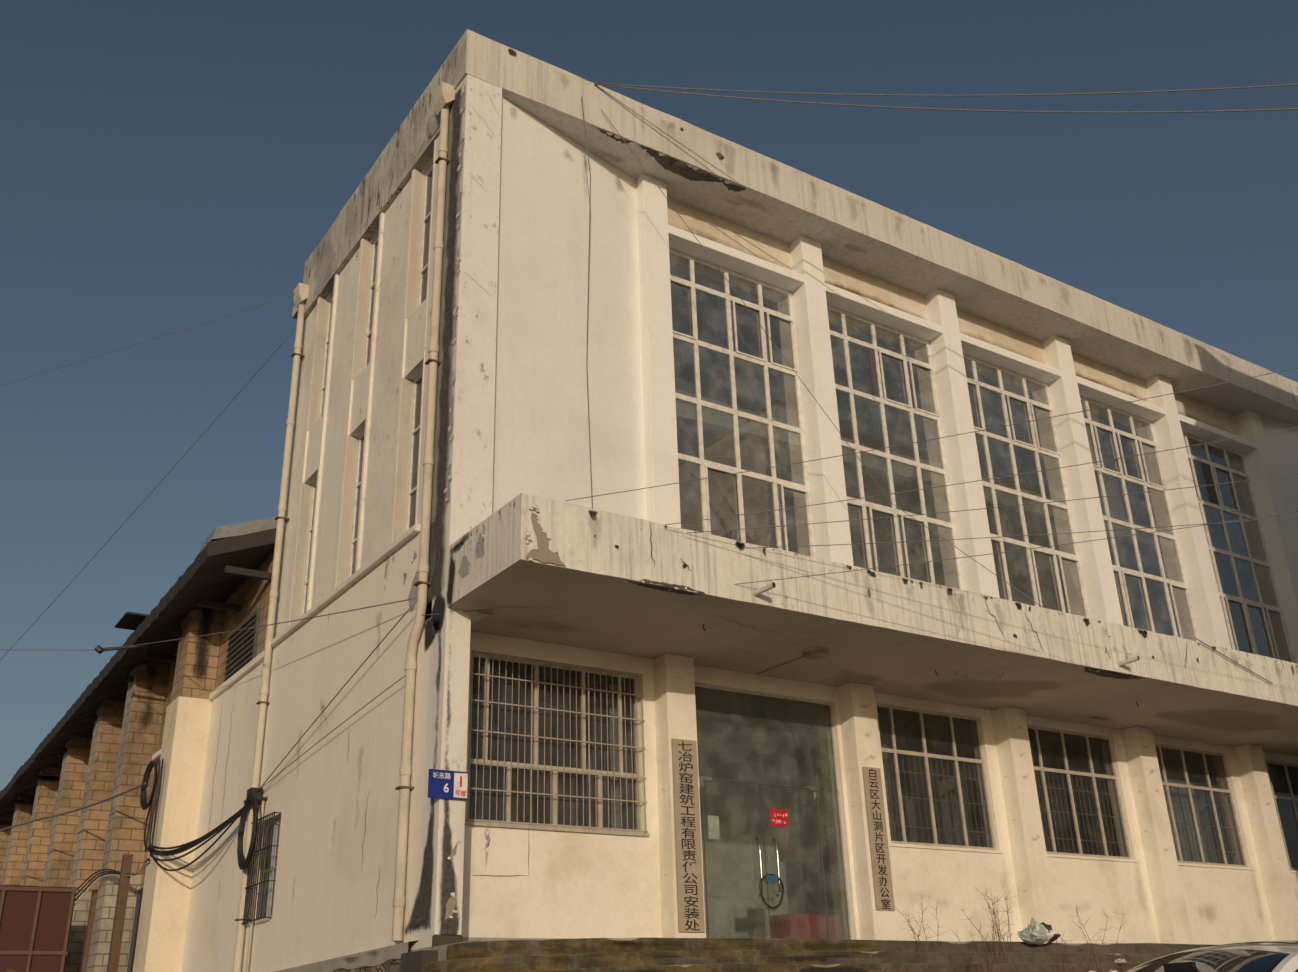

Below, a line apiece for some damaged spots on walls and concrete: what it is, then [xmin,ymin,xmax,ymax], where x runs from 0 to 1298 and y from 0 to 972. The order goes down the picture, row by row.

peeling [456,136,465,230]
peeling [444,462,452,505]
peeling [458,531,485,578]
peeling [525,504,566,566]
damp [405,798,459,935]